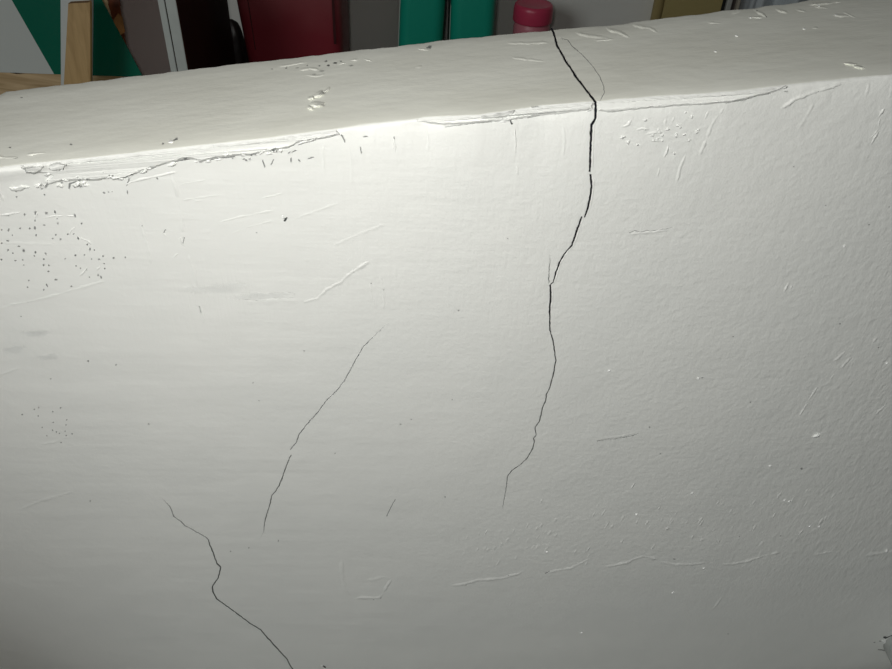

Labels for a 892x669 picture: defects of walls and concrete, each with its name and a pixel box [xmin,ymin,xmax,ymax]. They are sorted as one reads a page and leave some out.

crack [503,28,605,503]
crack [264,337,373,525]
crack [169,506,293,669]